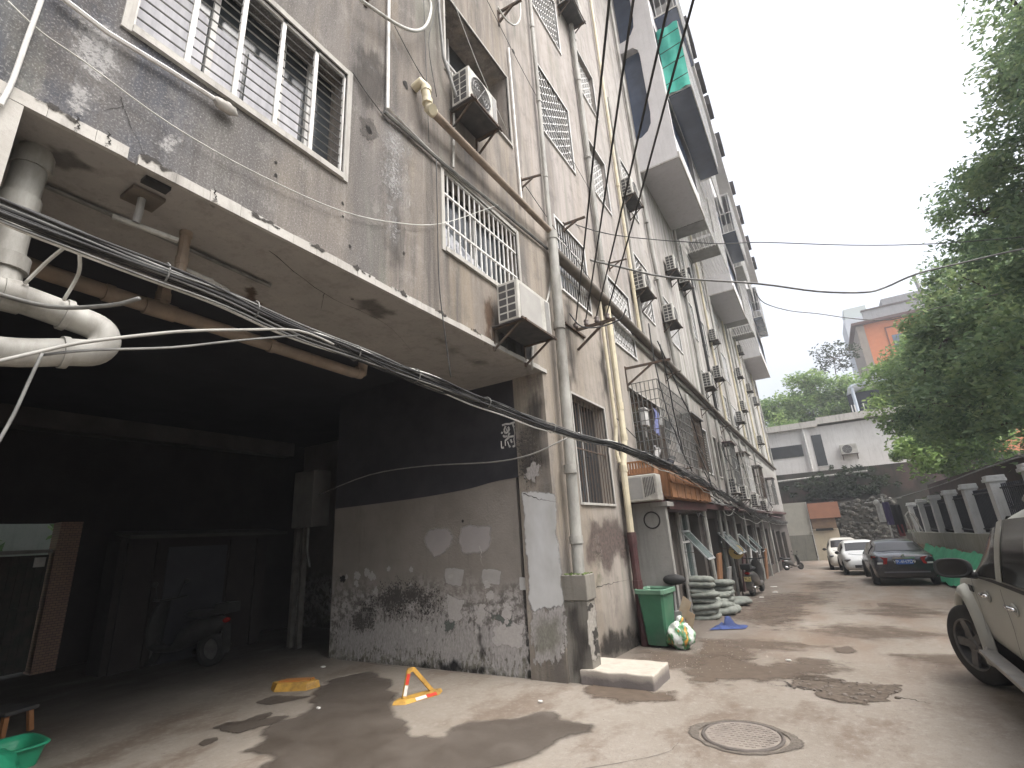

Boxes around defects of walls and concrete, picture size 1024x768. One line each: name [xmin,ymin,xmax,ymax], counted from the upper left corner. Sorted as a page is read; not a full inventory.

water stain [587,519,629,571]
water stain [350,576,455,634]
peeling [328,566,568,678]
water stain [422,626,485,673]